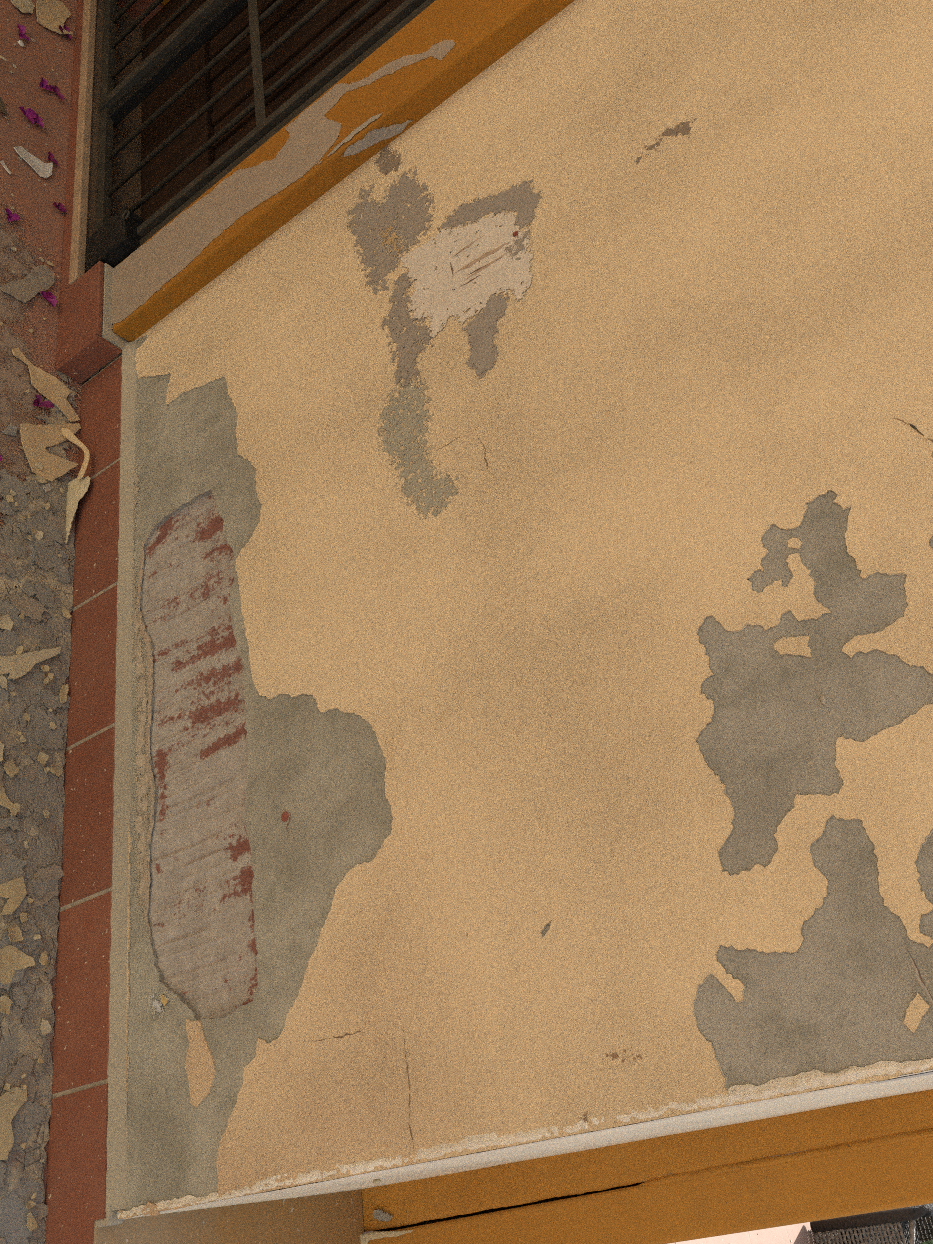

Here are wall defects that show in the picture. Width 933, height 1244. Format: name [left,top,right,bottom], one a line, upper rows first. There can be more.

peeling [111,40,542,389]
peeling [121,333,393,1219]
peeling [695,489,933,878]
peeling [693,814,933,1106]
crack [373,1173,673,1232]